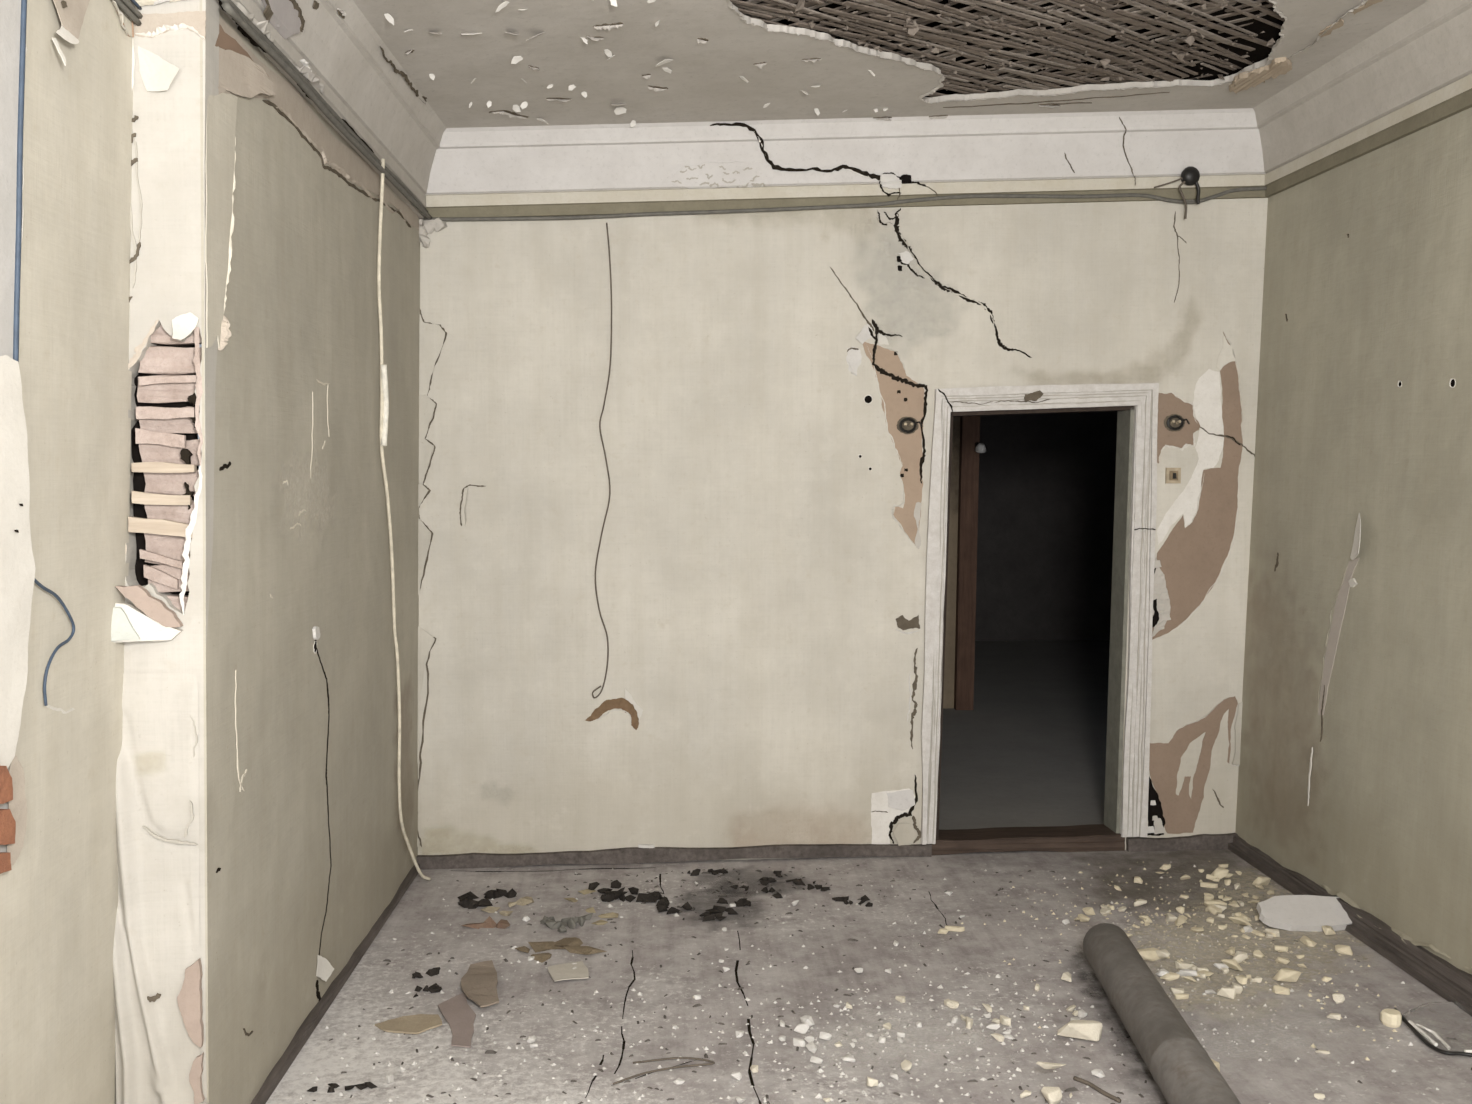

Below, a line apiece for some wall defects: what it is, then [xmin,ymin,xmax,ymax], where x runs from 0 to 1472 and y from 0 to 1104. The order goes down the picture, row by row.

peeling [580,0,623,60]
flaking render [0,0,27,359]
peeling [469,101,548,124]
crack [710,122,1032,358]
crack [1173,211,1186,302]
crack [830,267,989,412]
flaking render [125,312,231,615]
peeling [846,342,928,549]
peeling [1152,332,1243,640]
flaking render [0,766,16,874]
peeling [1147,696,1243,836]
peeling [177,958,206,1104]